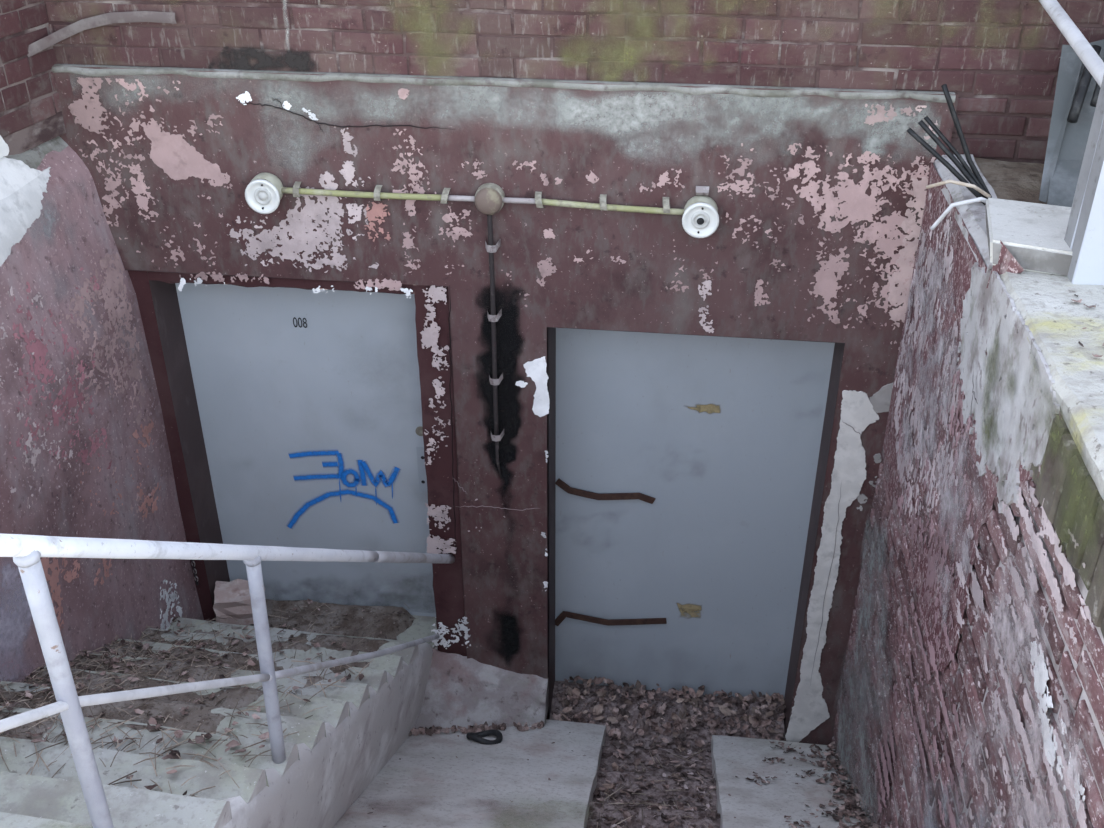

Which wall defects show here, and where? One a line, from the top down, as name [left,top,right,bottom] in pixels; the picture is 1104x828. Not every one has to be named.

crack [243,98,454,133]
peeling [864,104,927,126]
flaking render [0,135,51,266]
peeling [68,77,464,465]
peeling [438,206,473,247]
peeling [461,161,487,180]
peeling [665,239,719,333]
peeling [0,251,162,518]
damp [478,285,523,496]
flaking render [717,121,1094,828]
damp [495,613,519,663]